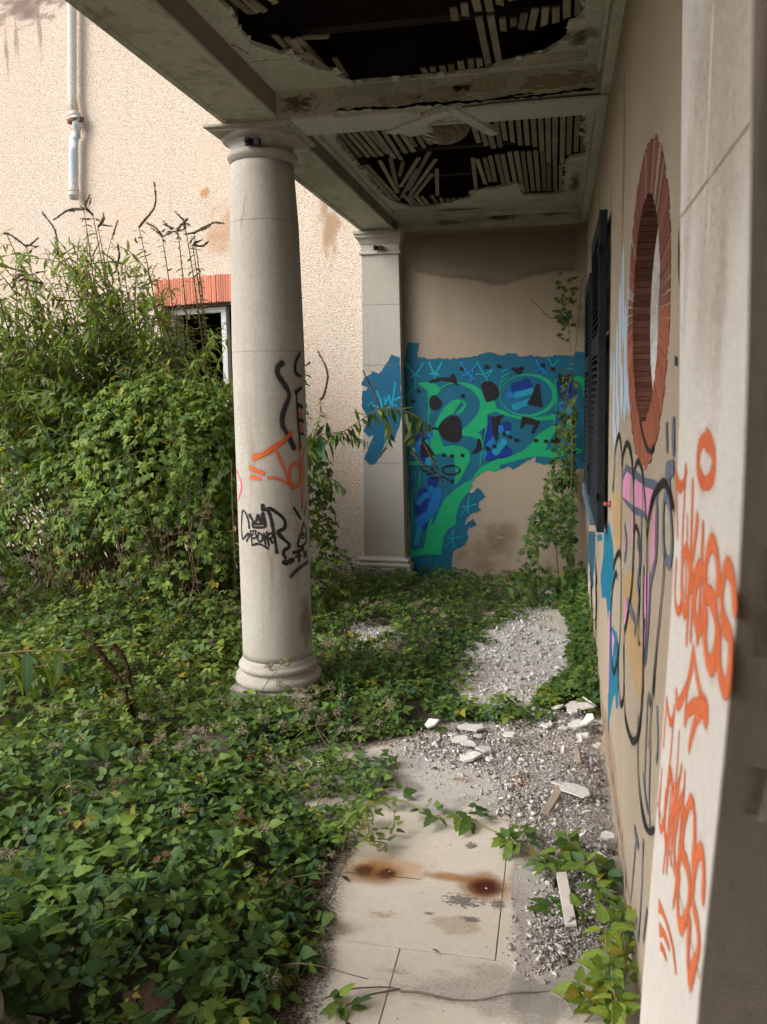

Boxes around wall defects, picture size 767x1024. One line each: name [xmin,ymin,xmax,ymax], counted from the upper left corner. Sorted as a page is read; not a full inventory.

water stain [5,0,49,18]
peeling [328,67,415,86]
peeling [386,0,597,137]
corrosion [356,861,403,881]
corrosion [434,874,498,897]